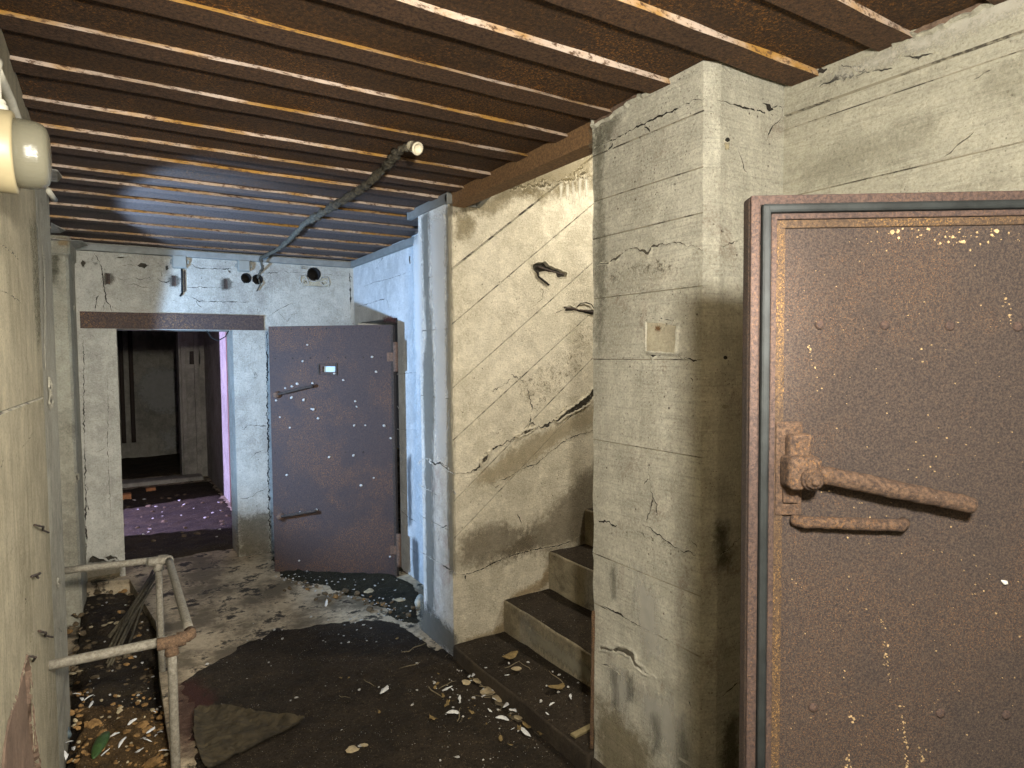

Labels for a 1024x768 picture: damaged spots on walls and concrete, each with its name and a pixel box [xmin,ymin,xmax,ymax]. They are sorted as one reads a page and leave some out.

crack [594,51,934,151]
leakage [413,154,592,655]
crack [401,374,617,580]
crack [642,454,741,557]
spalling [1,654,41,768]